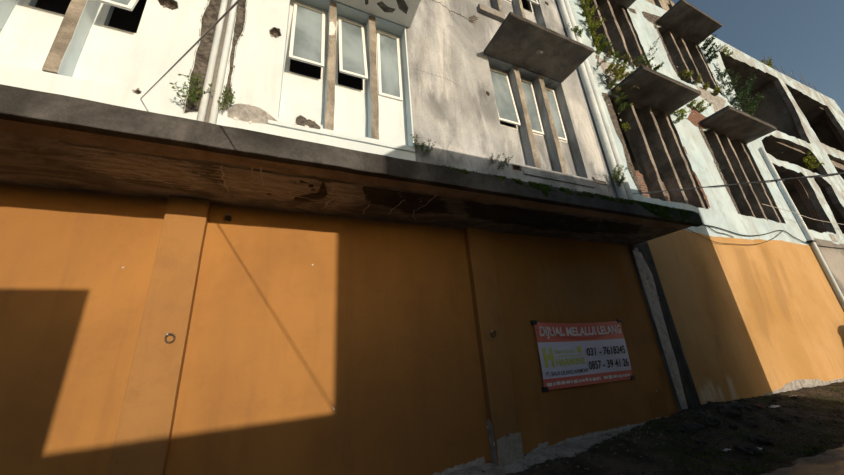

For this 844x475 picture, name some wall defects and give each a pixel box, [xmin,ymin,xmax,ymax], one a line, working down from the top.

spalling [155,0,181,12]
spalling [179,0,221,117]
peeling [218,0,323,131]
peeling [354,0,410,15]